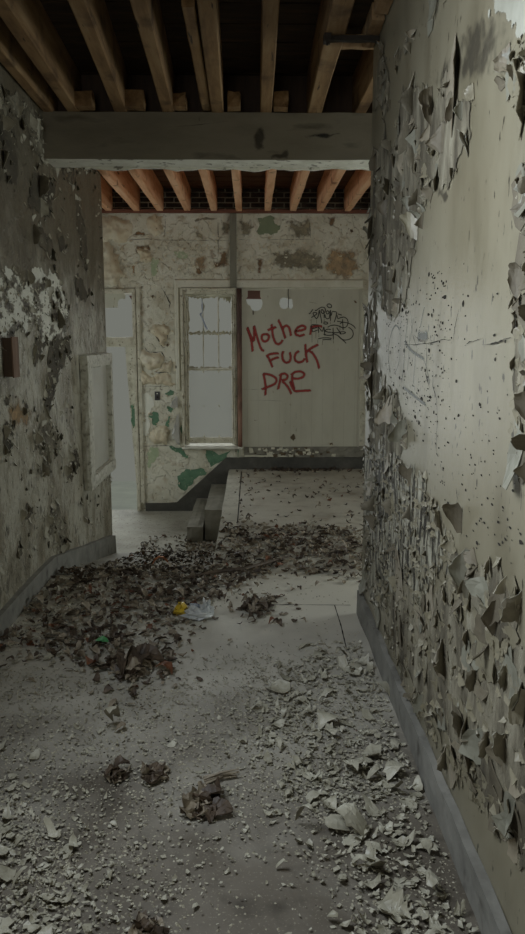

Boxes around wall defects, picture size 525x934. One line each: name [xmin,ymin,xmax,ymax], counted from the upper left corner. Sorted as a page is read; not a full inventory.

flaking render [488,0,525,141]
peeling [0,85,113,559]
flaking render [133,392,157,437]
peeling [244,33,525,870]